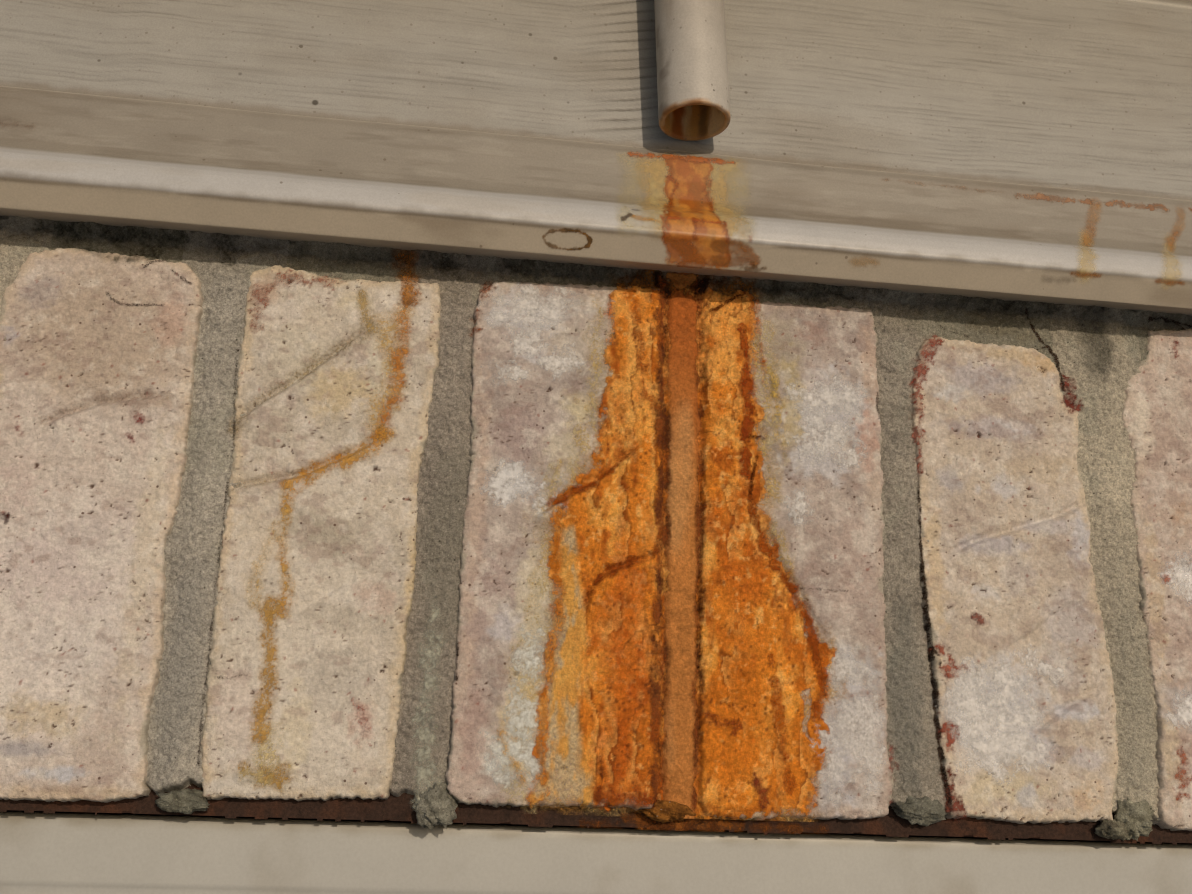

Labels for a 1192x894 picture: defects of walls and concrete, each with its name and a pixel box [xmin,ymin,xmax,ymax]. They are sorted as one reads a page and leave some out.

corrosion [238,249,420,789]
corrosion [500,152,836,834]
crack [1025,308,1065,392]
corrosion [1017,193,1168,211]